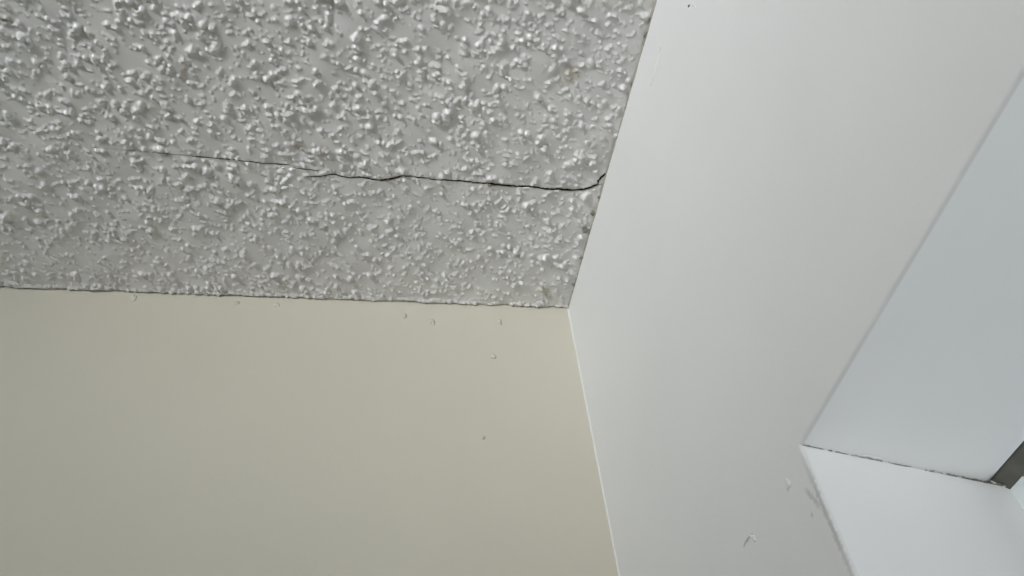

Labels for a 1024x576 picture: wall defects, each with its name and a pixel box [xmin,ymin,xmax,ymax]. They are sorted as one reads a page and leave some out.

crack [133,150,605,192]